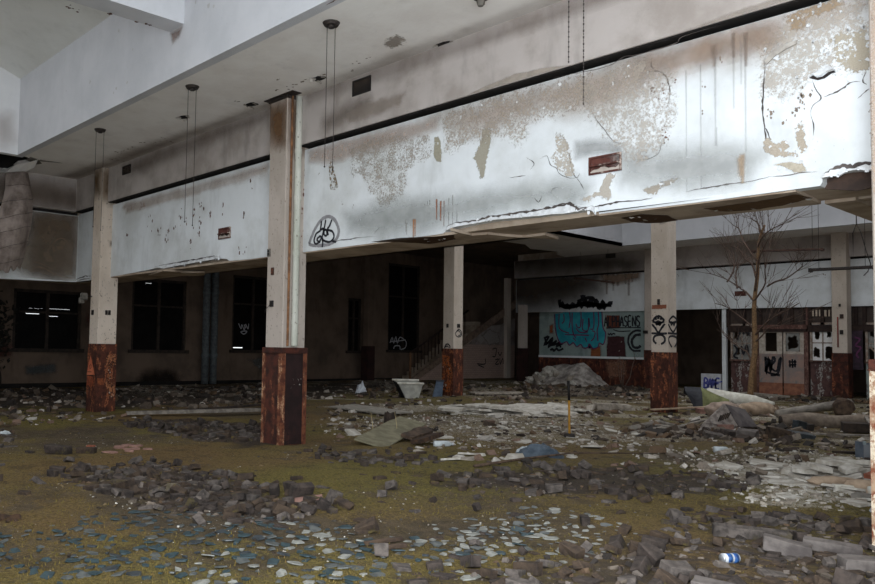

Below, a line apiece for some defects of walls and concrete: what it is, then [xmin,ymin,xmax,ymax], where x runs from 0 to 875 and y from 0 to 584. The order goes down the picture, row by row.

peeling [351,60,678,207]
crack [761,56,770,139]
peeling [758,0,875,191]
crack [811,73,869,135]
spalling [373,164,619,244]
corrosion [105,354,116,398]